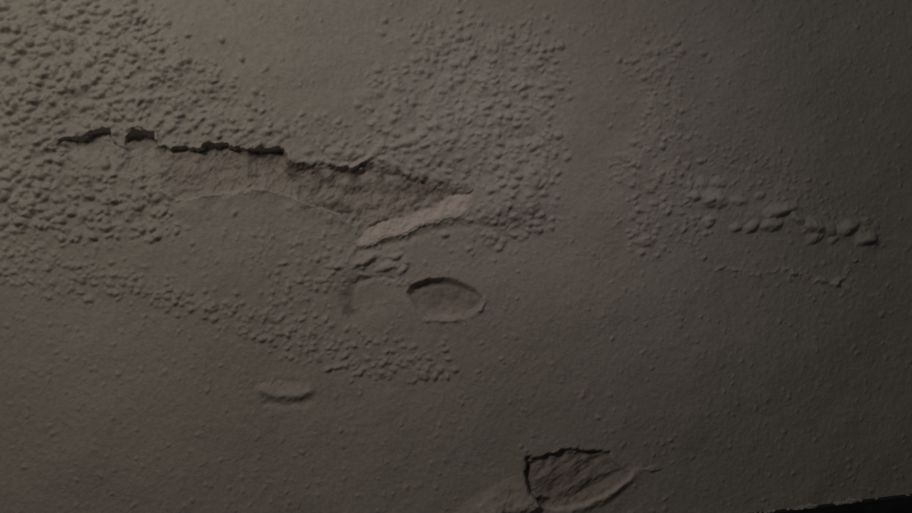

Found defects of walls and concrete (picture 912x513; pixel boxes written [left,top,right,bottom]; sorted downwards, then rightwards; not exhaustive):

peeling [47,120,474,247]
spalling [406,276,490,324]
spalling [456,447,648,513]